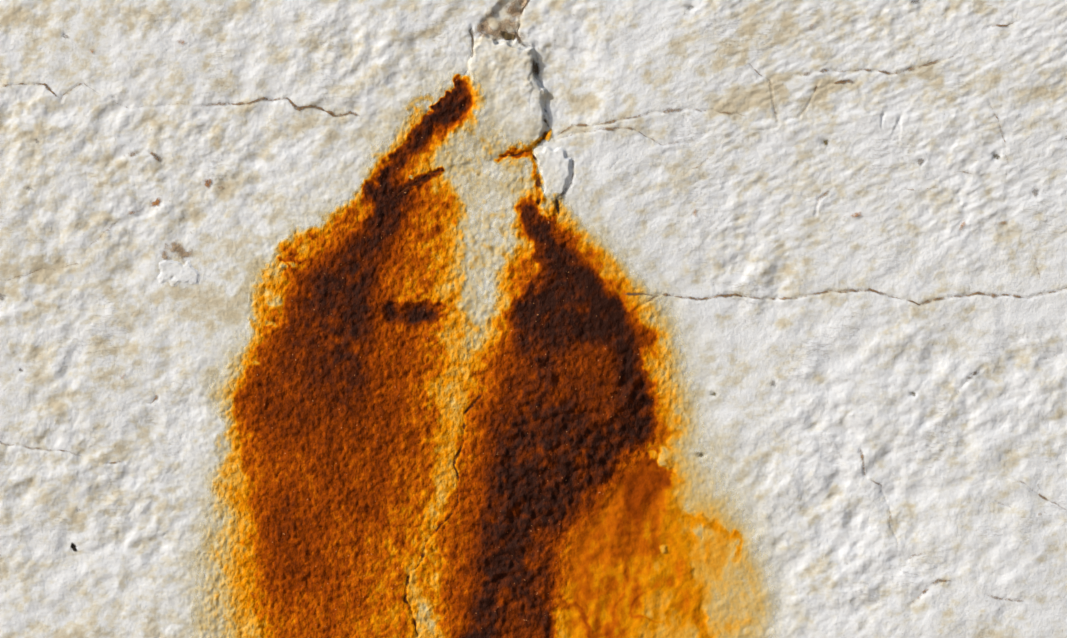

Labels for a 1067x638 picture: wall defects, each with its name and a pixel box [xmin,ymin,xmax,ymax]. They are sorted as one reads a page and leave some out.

crack [212,97,357,117]
crack [516,0,539,75]
crack [804,56,953,91]
crack [394,170,440,200]
crack [501,109,680,214]
crack [627,288,1021,305]
corrosion [196,73,776,638]
crack [403,395,481,635]